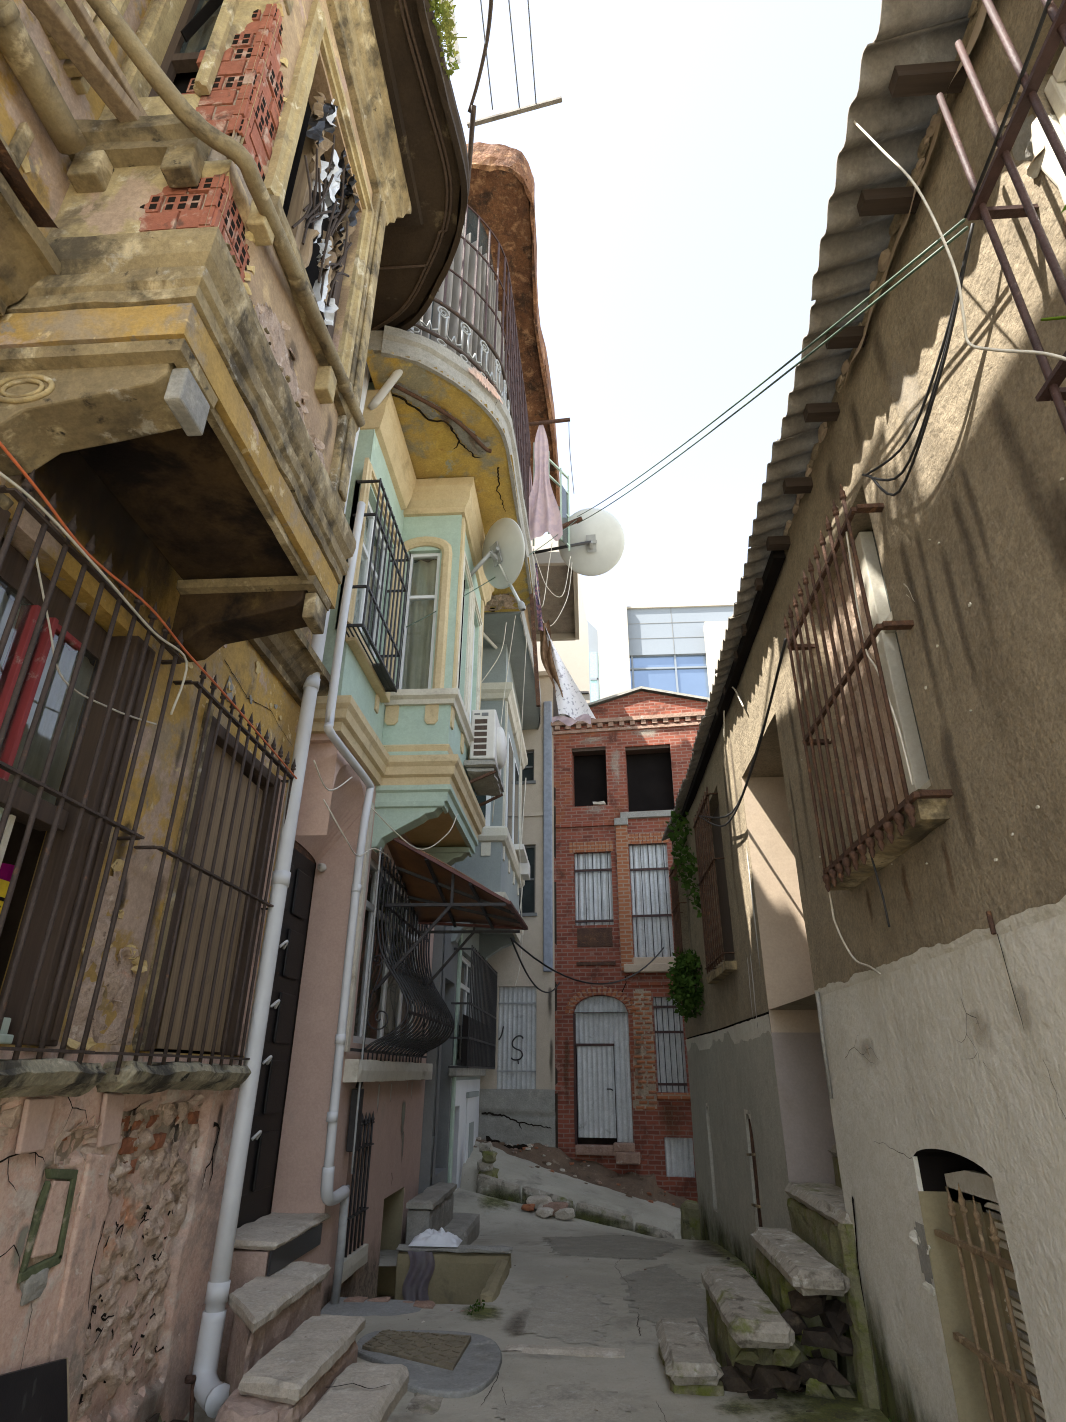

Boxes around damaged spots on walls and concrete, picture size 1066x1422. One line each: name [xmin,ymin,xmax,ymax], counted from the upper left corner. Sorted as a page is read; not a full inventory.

crack [392,394,506,512]
spalling [0,1097,23,1151]
crack [0,1152,45,1192]
crack [0,1245,32,1369]
flaking render [34,1094,204,1422]
leakage [867,1308,916,1422]